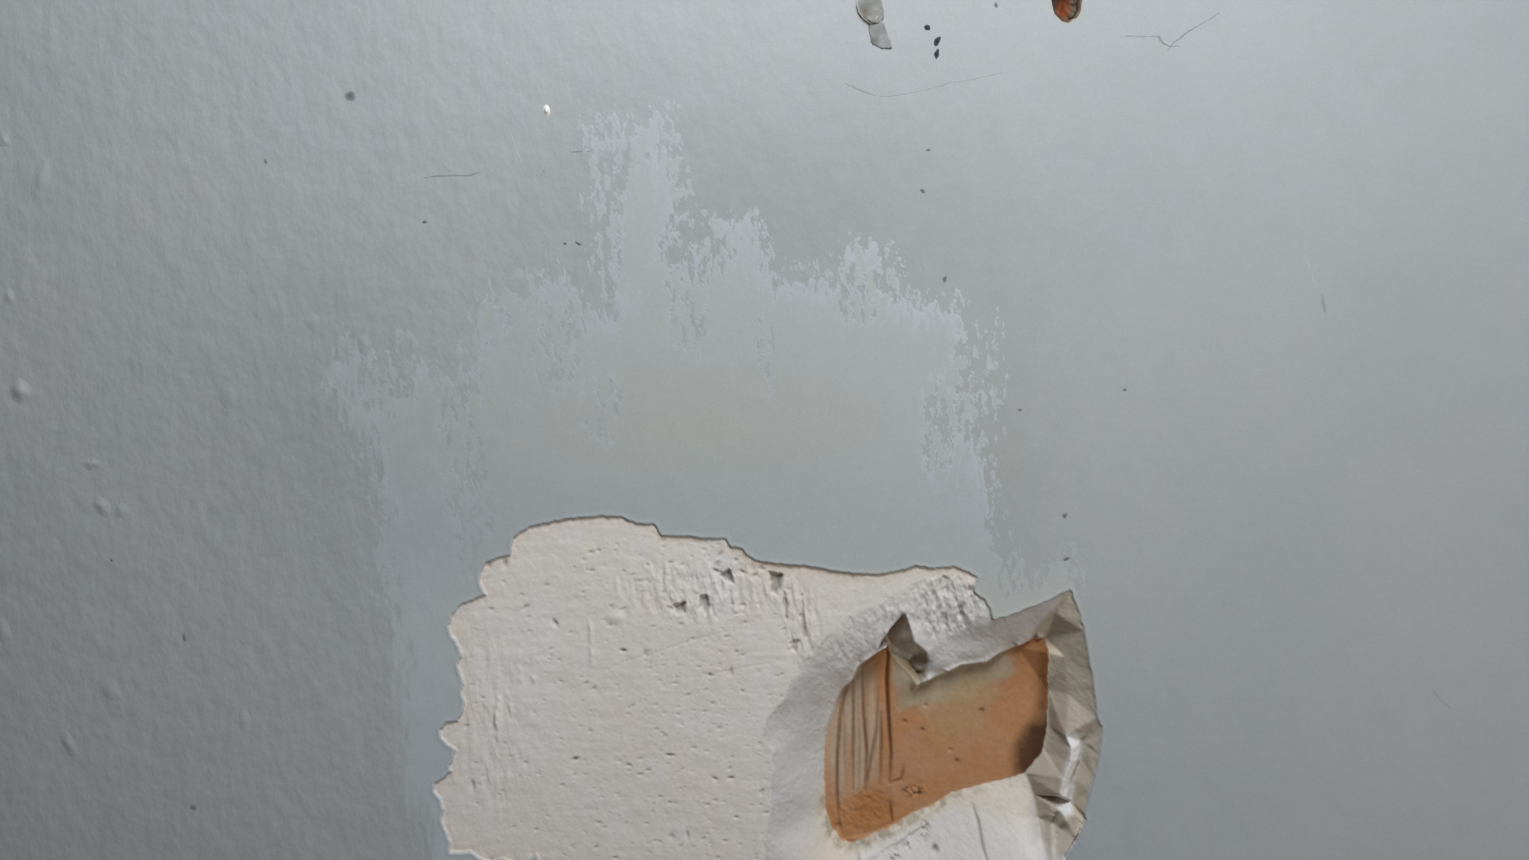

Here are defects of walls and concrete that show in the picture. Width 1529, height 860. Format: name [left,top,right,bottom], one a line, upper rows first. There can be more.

peeling [318,99,1102,860]